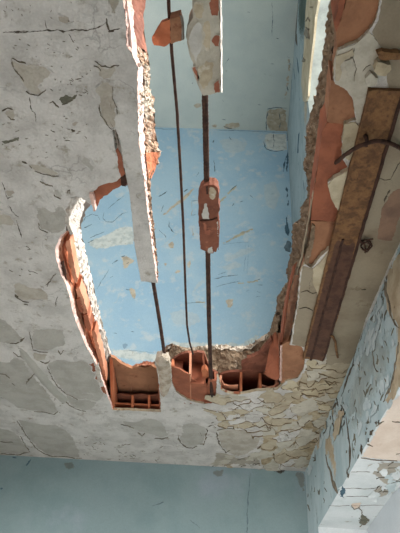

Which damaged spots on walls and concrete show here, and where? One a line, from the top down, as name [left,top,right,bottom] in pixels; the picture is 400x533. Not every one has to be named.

crack [3,18,120,43]
peeling [22,161,62,178]
spalling [116,148,125,177]
spalling [165,0,354,374]
spalling [0,181,118,415]
flaking render [201,107,400,503]
rust [306,237,358,362]
peeling [349,503,370,527]